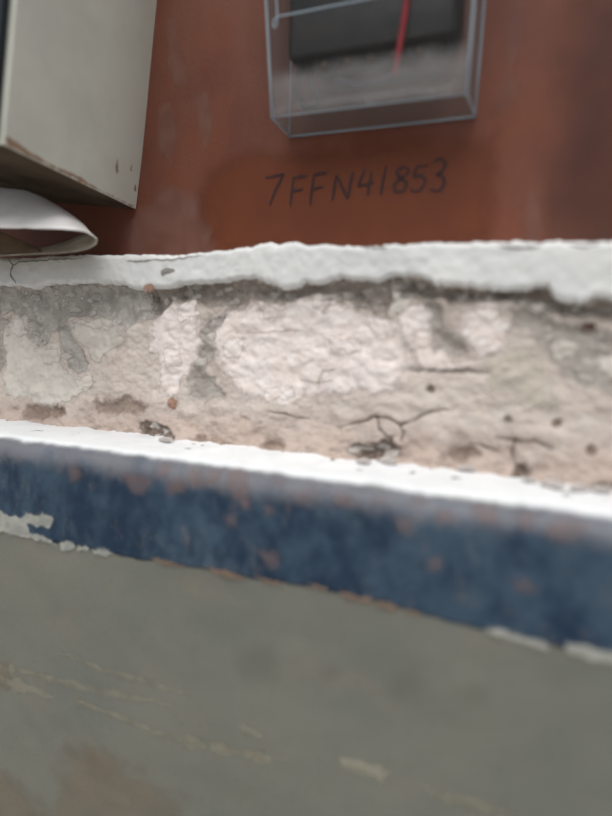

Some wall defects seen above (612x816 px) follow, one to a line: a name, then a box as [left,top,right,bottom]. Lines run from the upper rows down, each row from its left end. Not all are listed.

peeling [0,277,612,420]
flaking render [95,396,175,439]
flaking render [348,438,402,460]
flaking render [449,446,480,461]
flaking render [513,464,529,478]
peeling [0,511,111,557]